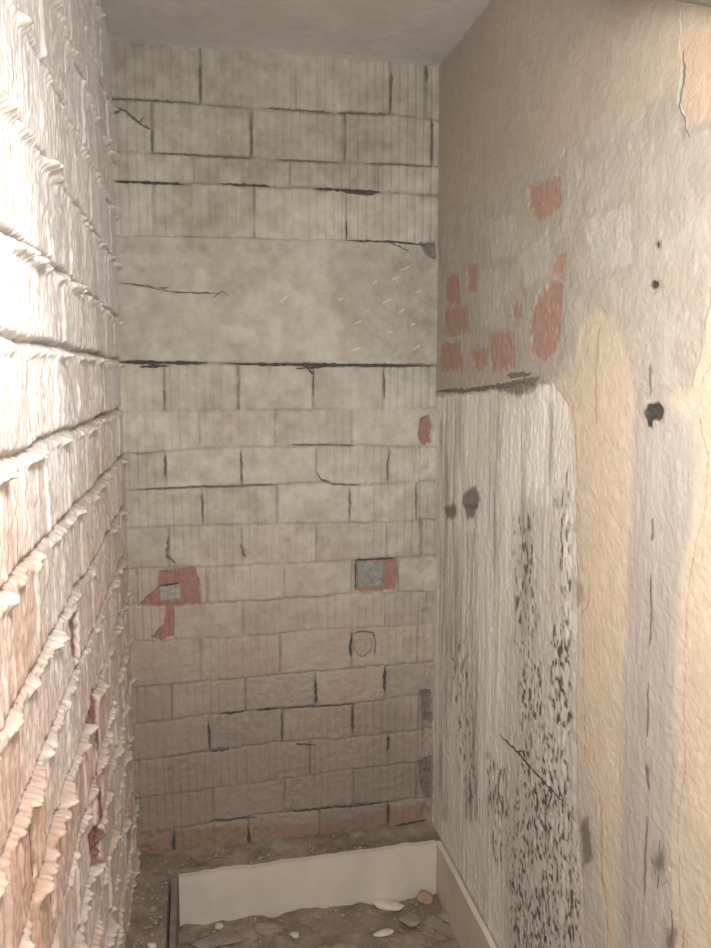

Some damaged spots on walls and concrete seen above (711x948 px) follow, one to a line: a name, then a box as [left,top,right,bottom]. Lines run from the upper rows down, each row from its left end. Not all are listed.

crack [112,65,393,159]
crack [314,187,380,196]
spalling [523,159,567,235]
spalling [436,237,574,385]
crack [120,360,208,368]
crack [233,362,426,398]
damp [369,360,436,392]
spalling [416,413,434,449]
crack [140,452,275,522]
spalling [134,565,203,643]
spalling [352,555,401,594]
damp [137,368,586,948]